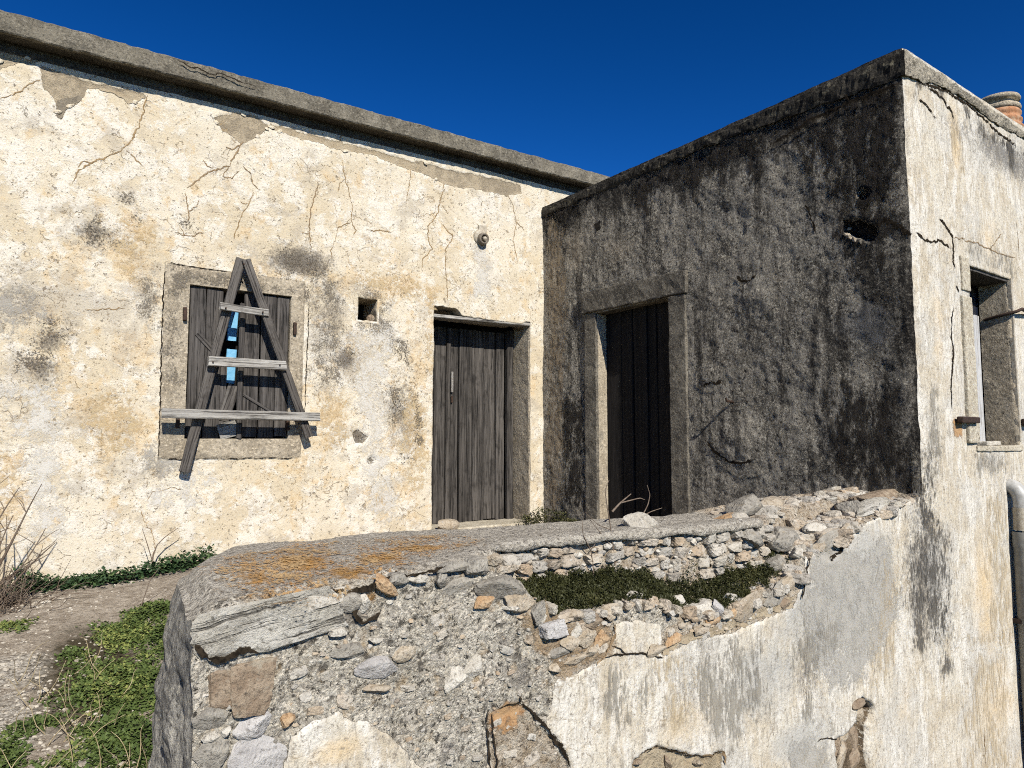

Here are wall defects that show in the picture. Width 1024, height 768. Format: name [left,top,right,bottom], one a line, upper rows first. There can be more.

flaking render [0,51,146,119]
crack [74,95,148,180]
crack [176,142,259,238]
crack [302,162,390,257]
flaking render [214,111,522,196]
crack [422,185,453,300]
leakage [632,82,904,284]
leakage [82,192,436,449]
crack [875,217,1019,401]
leakage [793,379,957,722]
flaking render [632,746,722,768]
spalling [835,698,869,768]